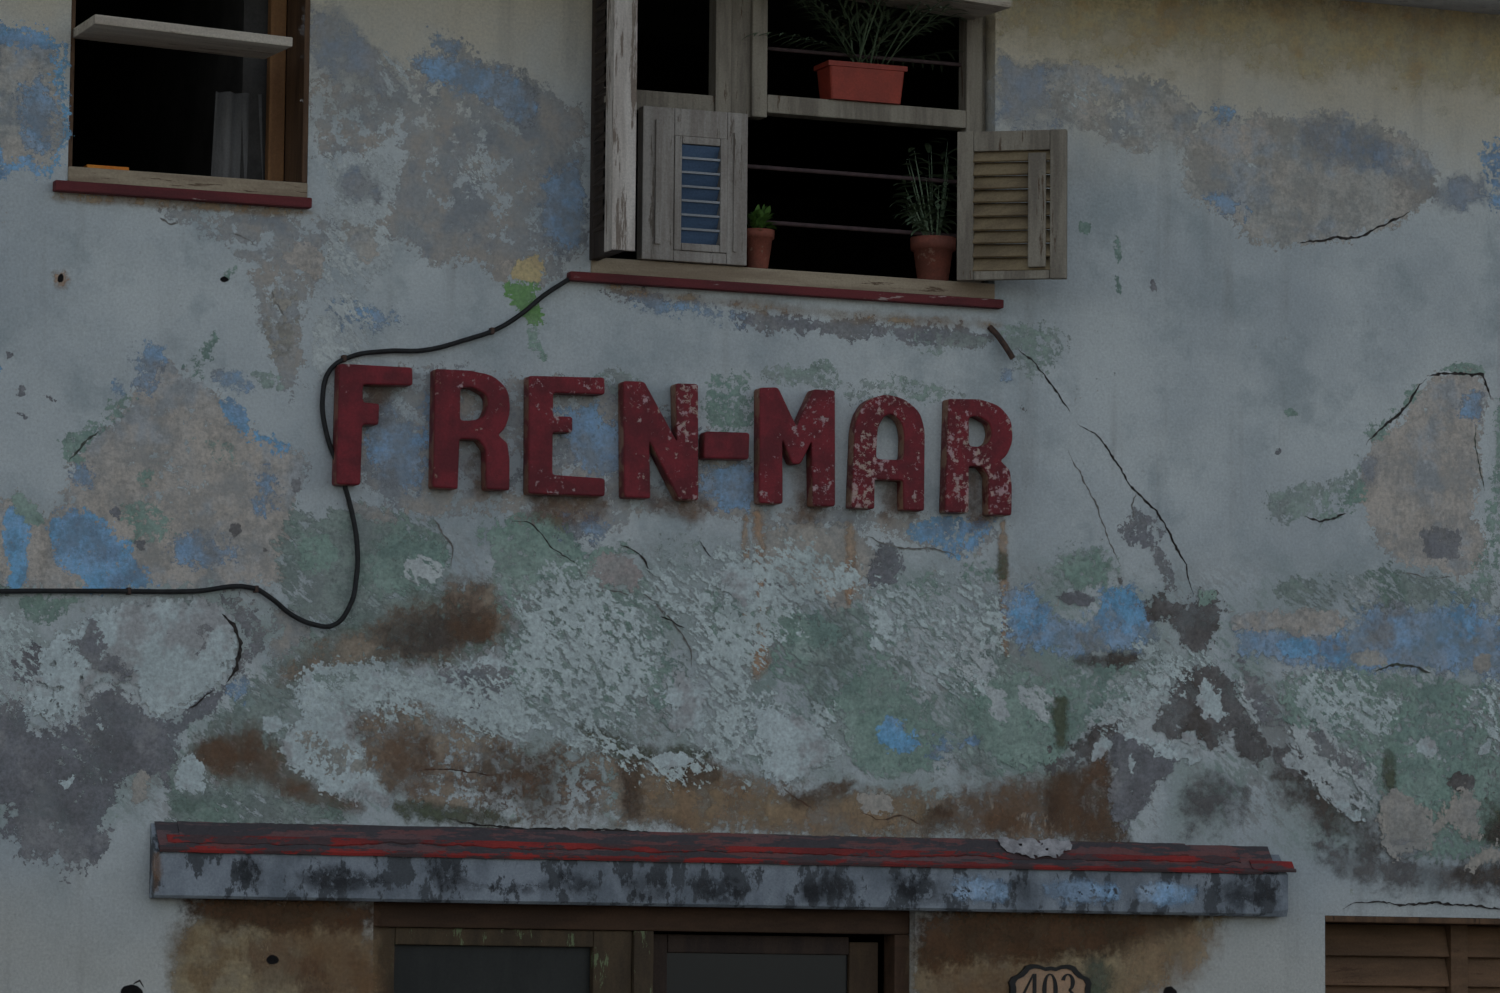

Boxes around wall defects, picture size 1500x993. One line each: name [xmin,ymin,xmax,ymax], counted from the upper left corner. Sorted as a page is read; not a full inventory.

peeling [0,19,75,181]
peeling [1179,103,1500,252]
crack [1018,349,1193,592]
peeling [0,205,1500,907]
crack [1345,901,1499,909]